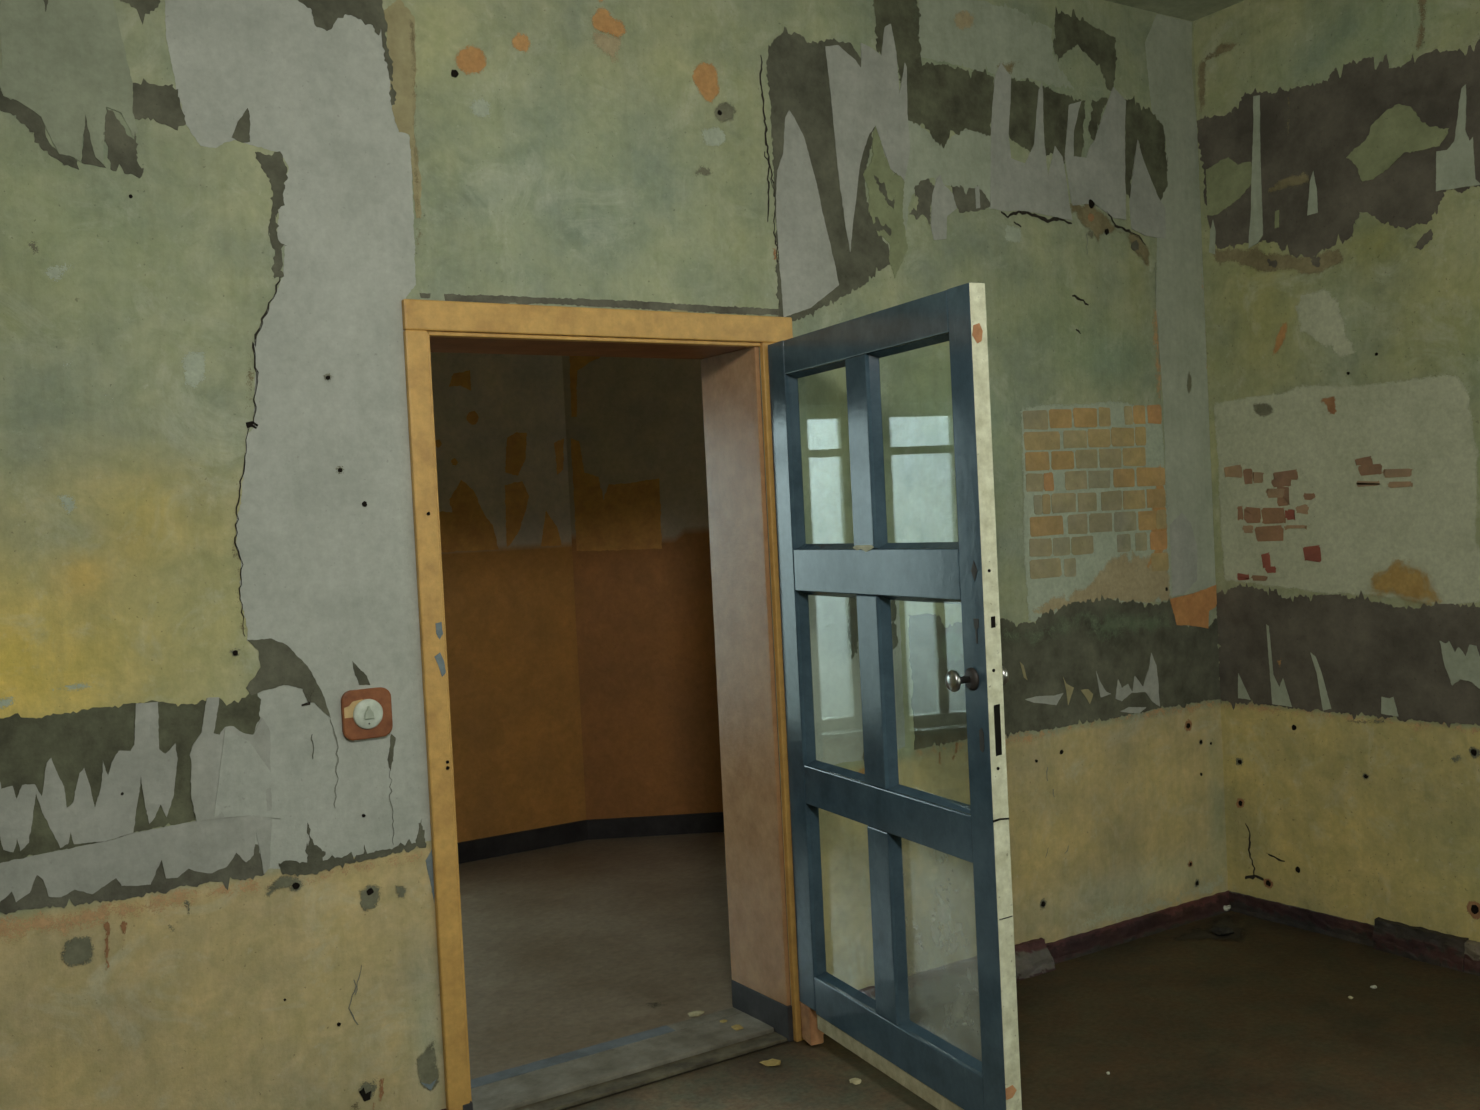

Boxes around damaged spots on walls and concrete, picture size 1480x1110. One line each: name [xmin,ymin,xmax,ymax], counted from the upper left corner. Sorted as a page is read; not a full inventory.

flaking render [0,0,446,915]
crack [232,277,280,636]
crack [1001,211,1088,255]
peeling [766,0,1480,774]
crack [1245,823,1285,881]